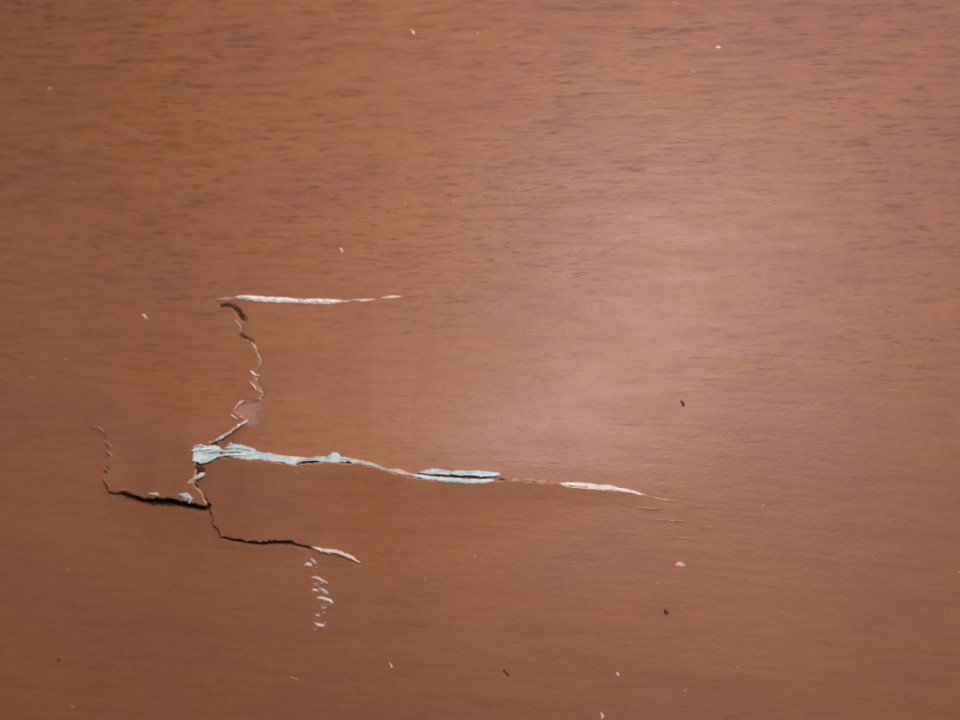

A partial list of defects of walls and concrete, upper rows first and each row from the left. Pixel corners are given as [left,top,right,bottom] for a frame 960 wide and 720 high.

crack [148,292,695,540]
spalling [305,558,333,631]